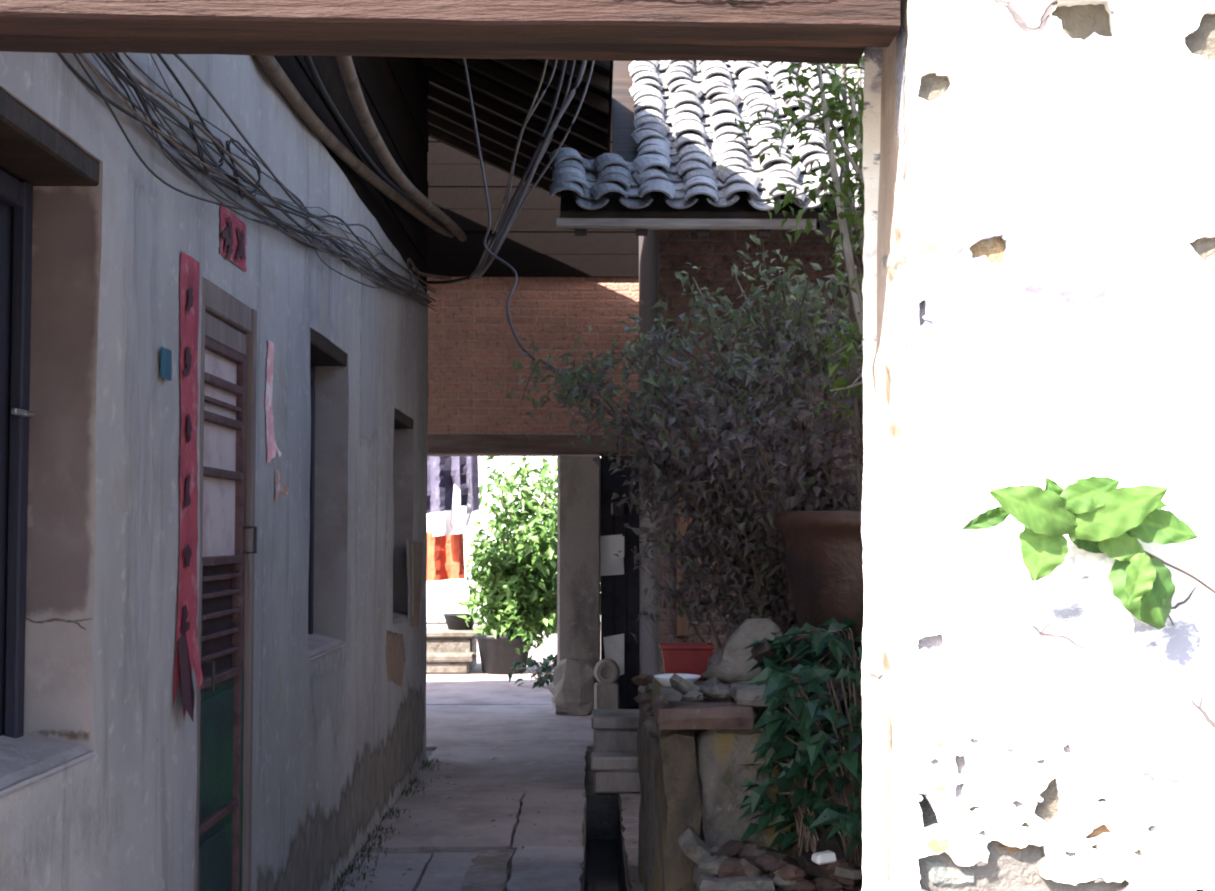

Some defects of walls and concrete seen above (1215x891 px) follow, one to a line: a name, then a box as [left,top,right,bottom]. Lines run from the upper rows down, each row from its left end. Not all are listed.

crack [994,0,1058,33]
spalling [1051,1,1117,47]
spalling [1184,10,1215,61]
spalling [917,67,953,102]
spalling [969,235,1010,265]
spalling [1189,235,1215,262]
crack [26,618,93,630]
water stain [257,687,424,891]
spalling [912,794,944,830]
spalling [1012,777,1062,828]
spalling [1084,824,1121,850]
spalling [917,830,1130,891]